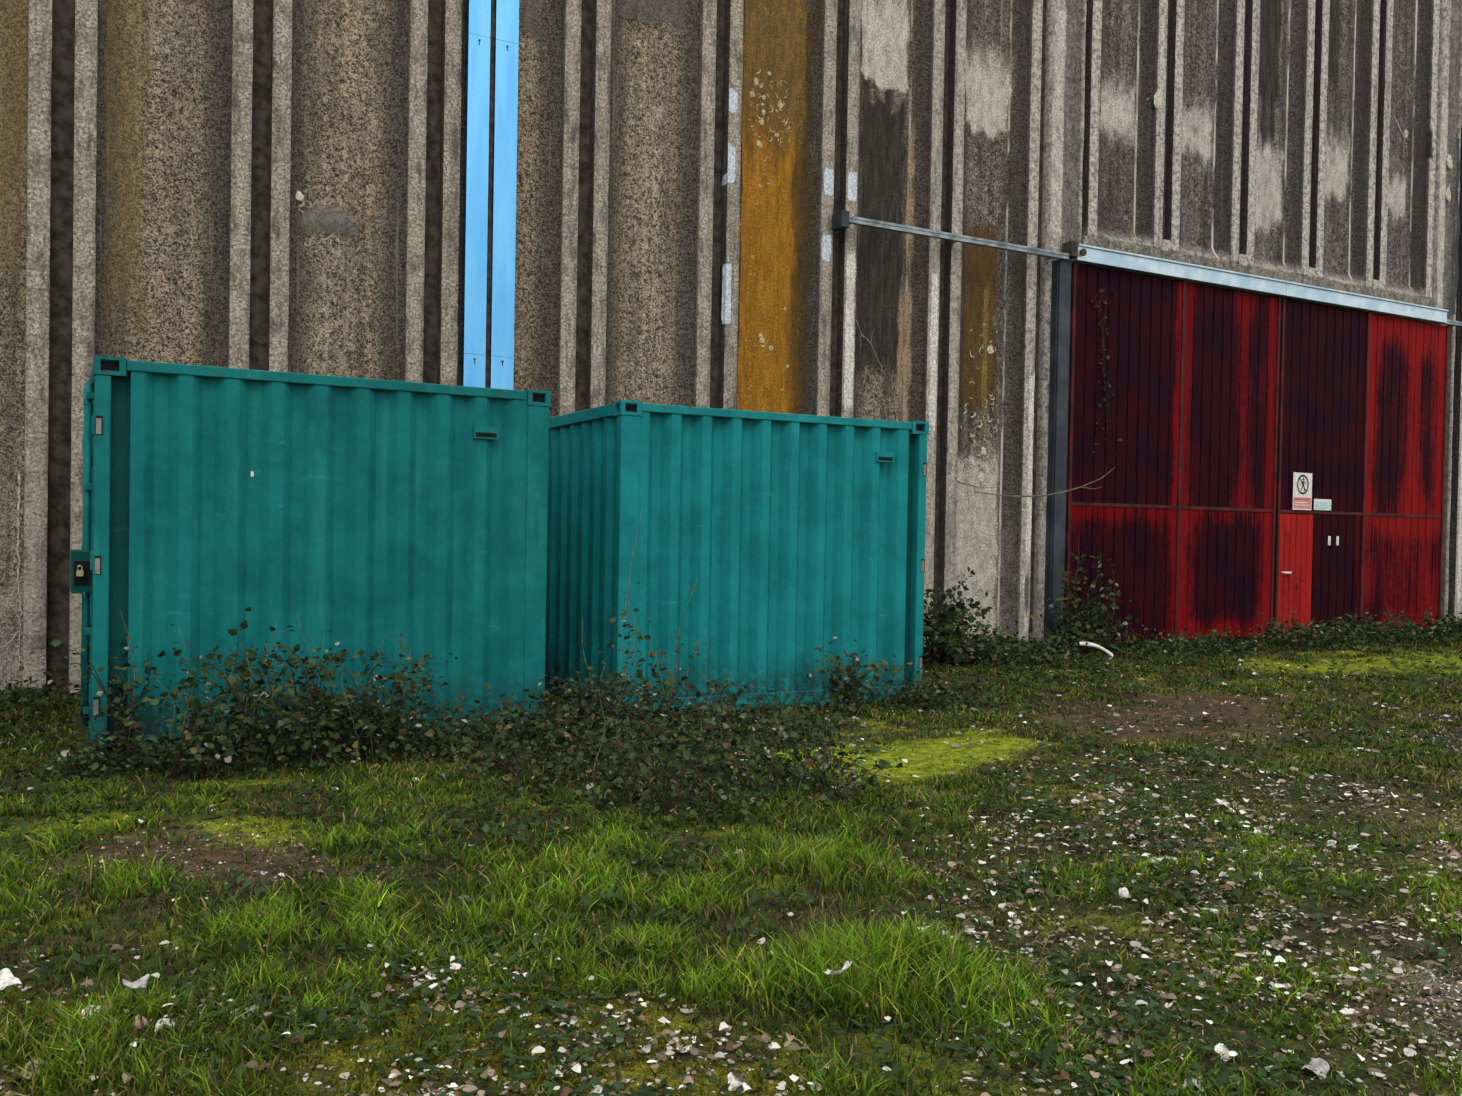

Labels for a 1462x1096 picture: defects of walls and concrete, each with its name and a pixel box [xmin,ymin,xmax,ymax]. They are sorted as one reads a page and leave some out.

rust [737,0,814,414]
water stain [844,0,909,411]
water stain [965,51,1011,139]
water stain [1049,7,1066,241]
water stain [1099,81,1136,140]
water stain [1255,0,1285,232]
water stain [1328,0,1340,87]
water stain [1325,134,1350,208]
water stain [1388,173,1406,220]
water stain [1425,94,1448,308]
water stain [928,271,939,437]
rust [961,222,998,430]